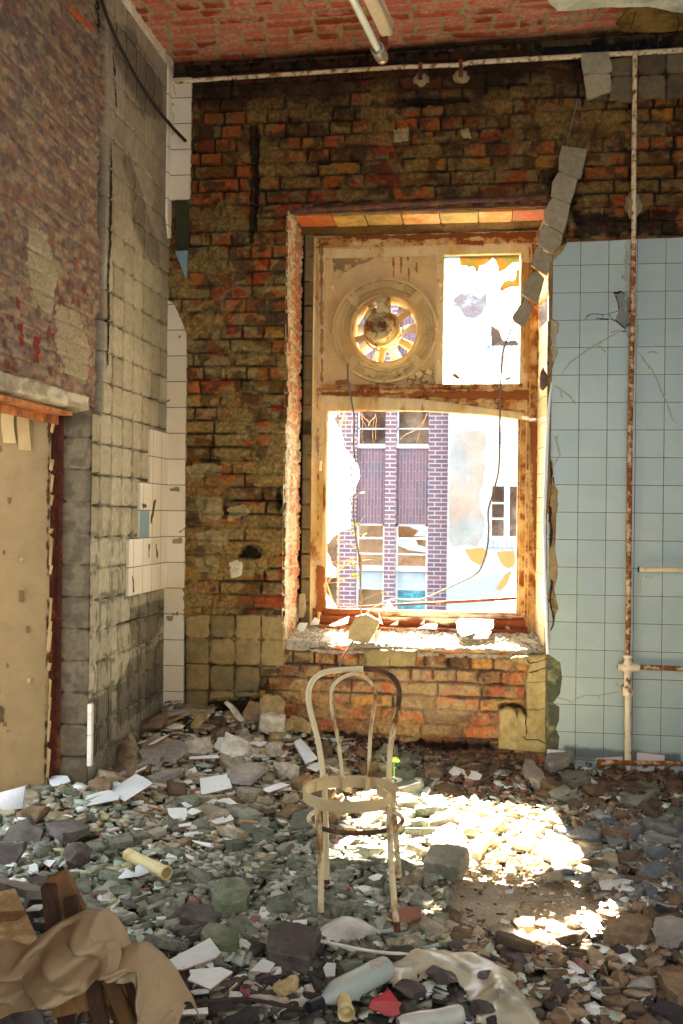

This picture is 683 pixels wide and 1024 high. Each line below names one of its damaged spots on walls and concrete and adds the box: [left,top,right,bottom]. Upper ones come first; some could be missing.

spalling [585,291,630,339]
crack [526,653,547,683]
crack [523,708,546,744]